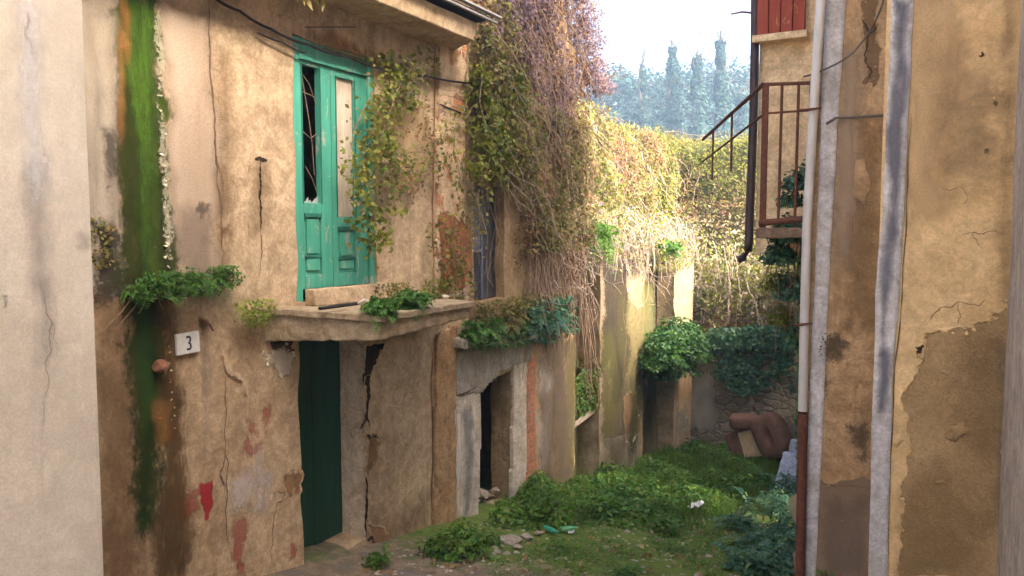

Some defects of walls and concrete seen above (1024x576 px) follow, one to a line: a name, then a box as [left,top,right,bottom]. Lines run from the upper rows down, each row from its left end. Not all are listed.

peeling [859,0,884,93]
crack [208,0,225,264]
crack [39,278,58,437]
water stain [82,0,222,576]
crack [255,156,268,276]
flaking render [262,341,296,379]
flaking render [281,466,304,500]
crack [364,479,375,544]
crack [359,344,383,438]
spalling [433,177,474,292]
peeling [893,293,1009,576]
crack [928,297,991,323]